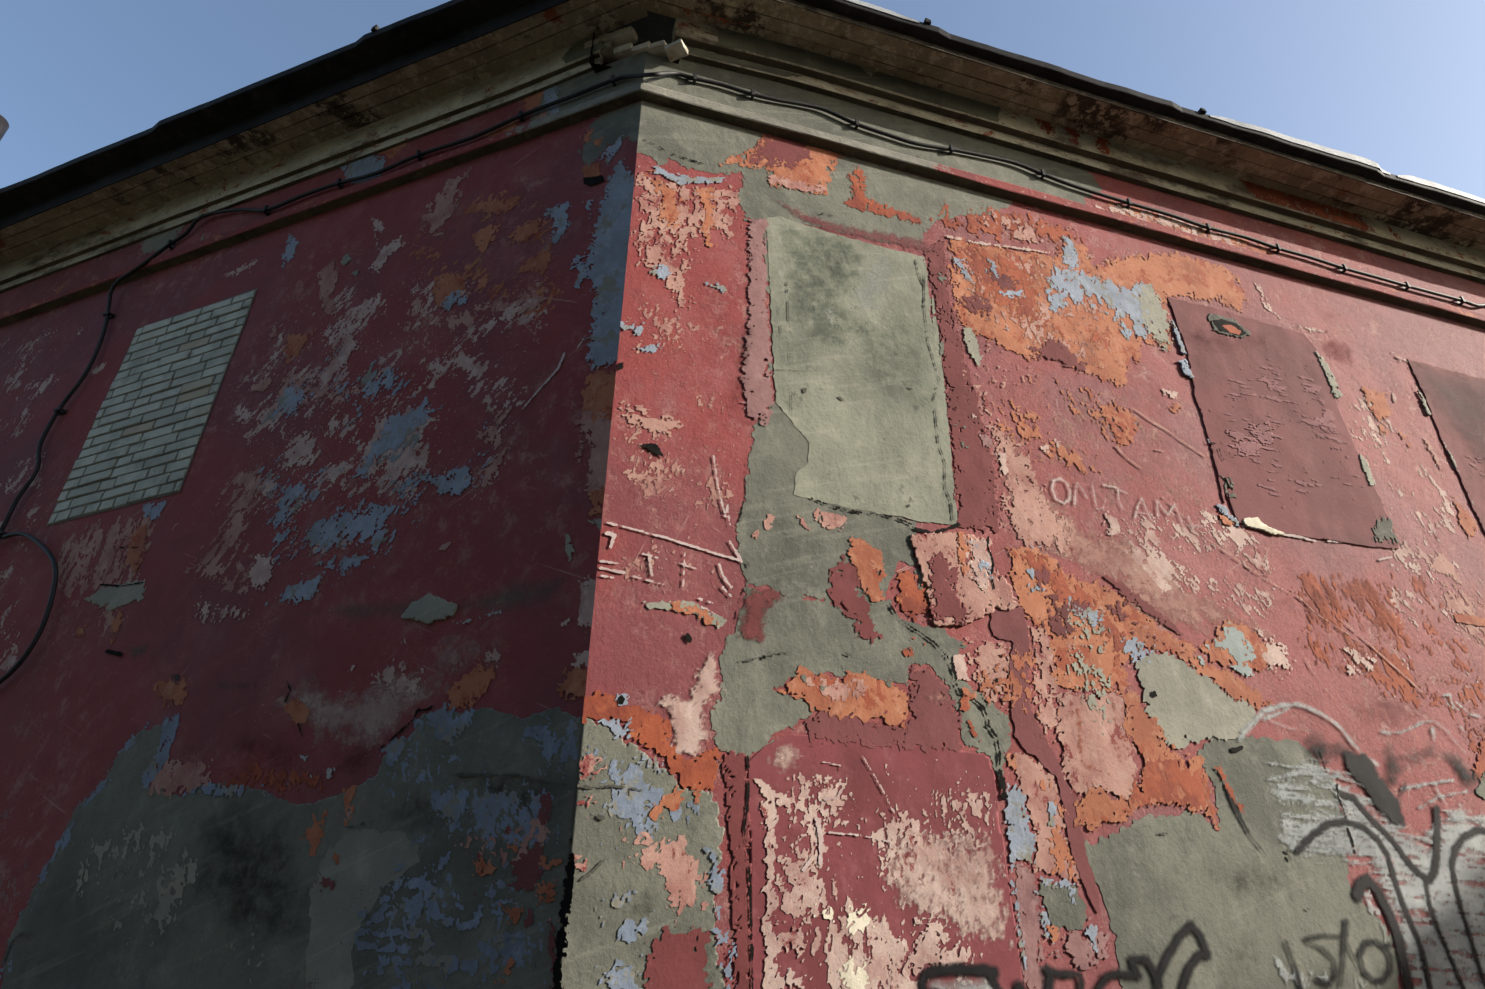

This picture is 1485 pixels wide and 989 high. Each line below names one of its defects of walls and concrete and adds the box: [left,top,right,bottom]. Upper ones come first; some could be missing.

peeling [484,86,562,137]
peeling [140,226,184,254]
peeling [0,320,83,438]
peeling [0,429,54,671]
peeling [50,498,179,644]
crack [811,259,1013,799]
peeling [0,673,269,979]
crack [454,773,643,989]
crack [743,755,754,989]